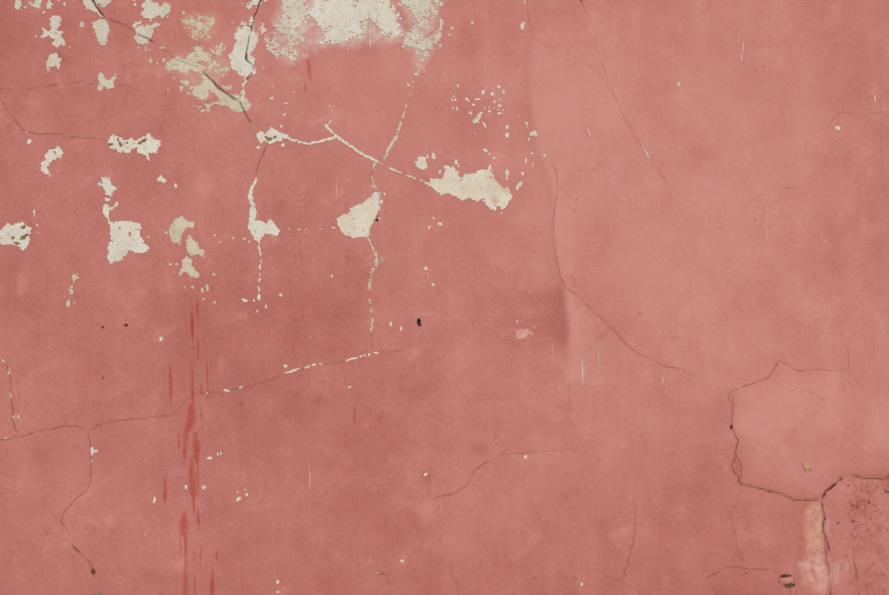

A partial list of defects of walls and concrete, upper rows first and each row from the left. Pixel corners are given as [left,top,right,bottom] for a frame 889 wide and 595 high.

peeling [14,0,111,72]
peeling [132,0,455,112]
peeling [0,210,39,251]
peeling [97,177,150,264]
peeling [108,133,162,161]
peeling [165,216,216,304]
peeling [232,178,306,313]
crack [289,68,429,192]
peeling [332,185,386,238]
crack [346,237,384,361]
peeling [414,149,546,214]
crack [283,363,324,374]